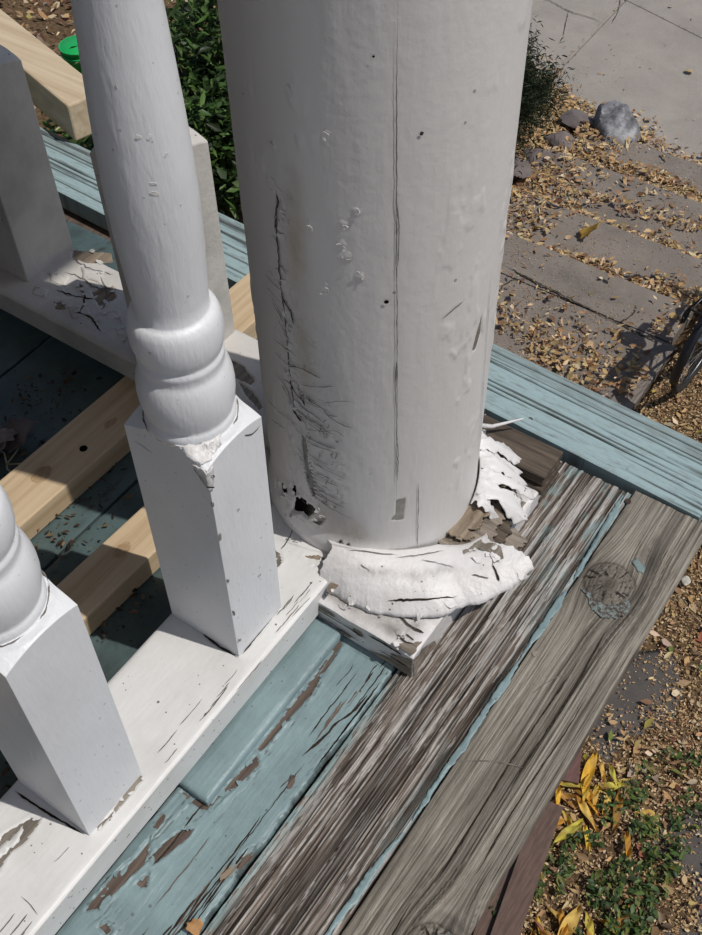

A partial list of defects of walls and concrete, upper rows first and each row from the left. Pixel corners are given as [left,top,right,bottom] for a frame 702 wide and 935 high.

crack [58,259,112,332]
crack [348,25,452,571]
crack [245,195,352,519]
peeling [182,434,222,491]
peeling [476,431,535,525]
peeling [574,495,623,579]
peeling [183,628,362,812]
peeling [413,589,568,820]
peeling [0,815,41,867]
peeling [97,776,146,831]
peeling [86,821,203,911]
peeling [325,833,403,935]